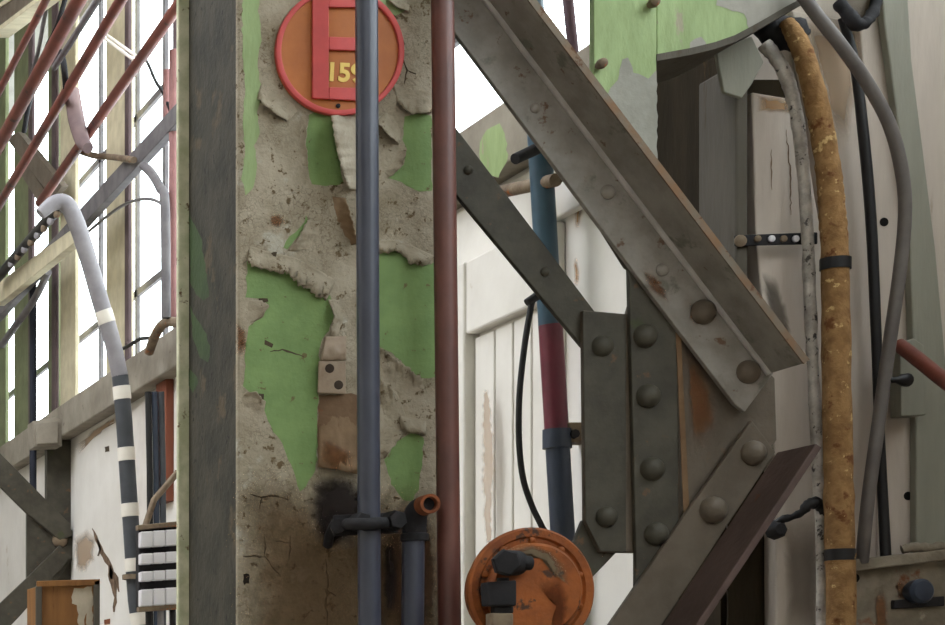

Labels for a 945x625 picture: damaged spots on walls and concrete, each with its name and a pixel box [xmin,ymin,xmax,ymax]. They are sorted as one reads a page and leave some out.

peeling [380,0,410,16]
peeling [690,37,706,48]
peeling [716,0,797,28]
peeling [241,0,356,245]
peeling [379,84,433,192]
crack [771,130,792,210]
peeling [242,217,357,491]
peeling [379,240,435,501]
crack [251,494,286,508]
peeling [72,586,110,625]
water stain [252,498,358,625]
water stain [381,533,401,625]